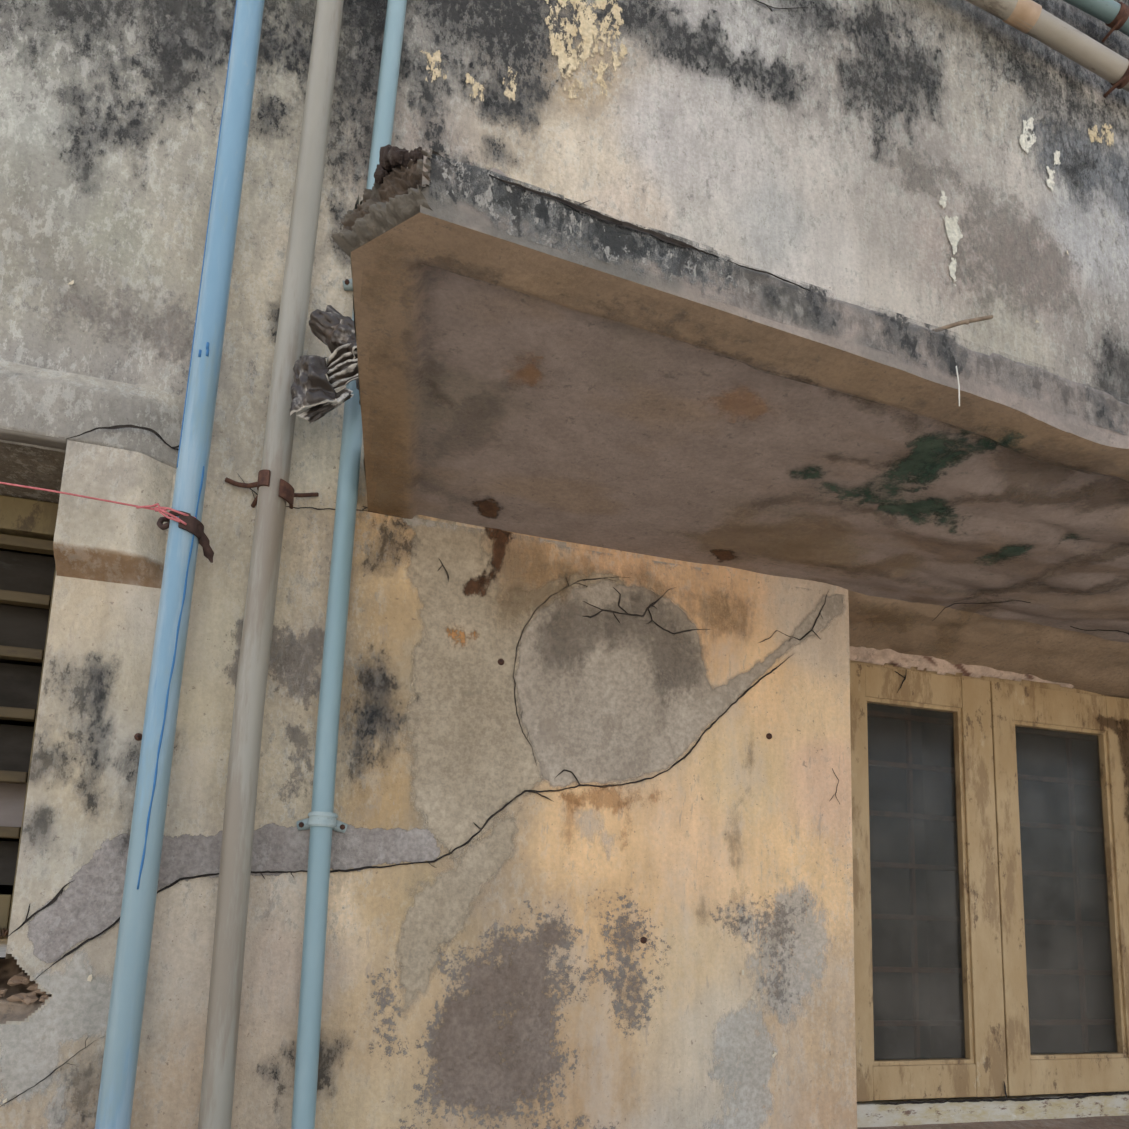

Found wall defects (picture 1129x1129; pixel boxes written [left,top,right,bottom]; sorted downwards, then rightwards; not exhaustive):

water stain [0,0,236,192]
spalling [331,144,458,257]
peeling [545,0,627,99]
water stain [400,0,809,286]
peeling [939,190,963,286]
water stain [1003,47,1129,213]
crack [67,425,179,450]
rust [463,499,512,597]
crack [251,577,829,879]
crack [9,881,72,936]
peeling [0,953,112,1129]
water stain [366,889,673,1129]